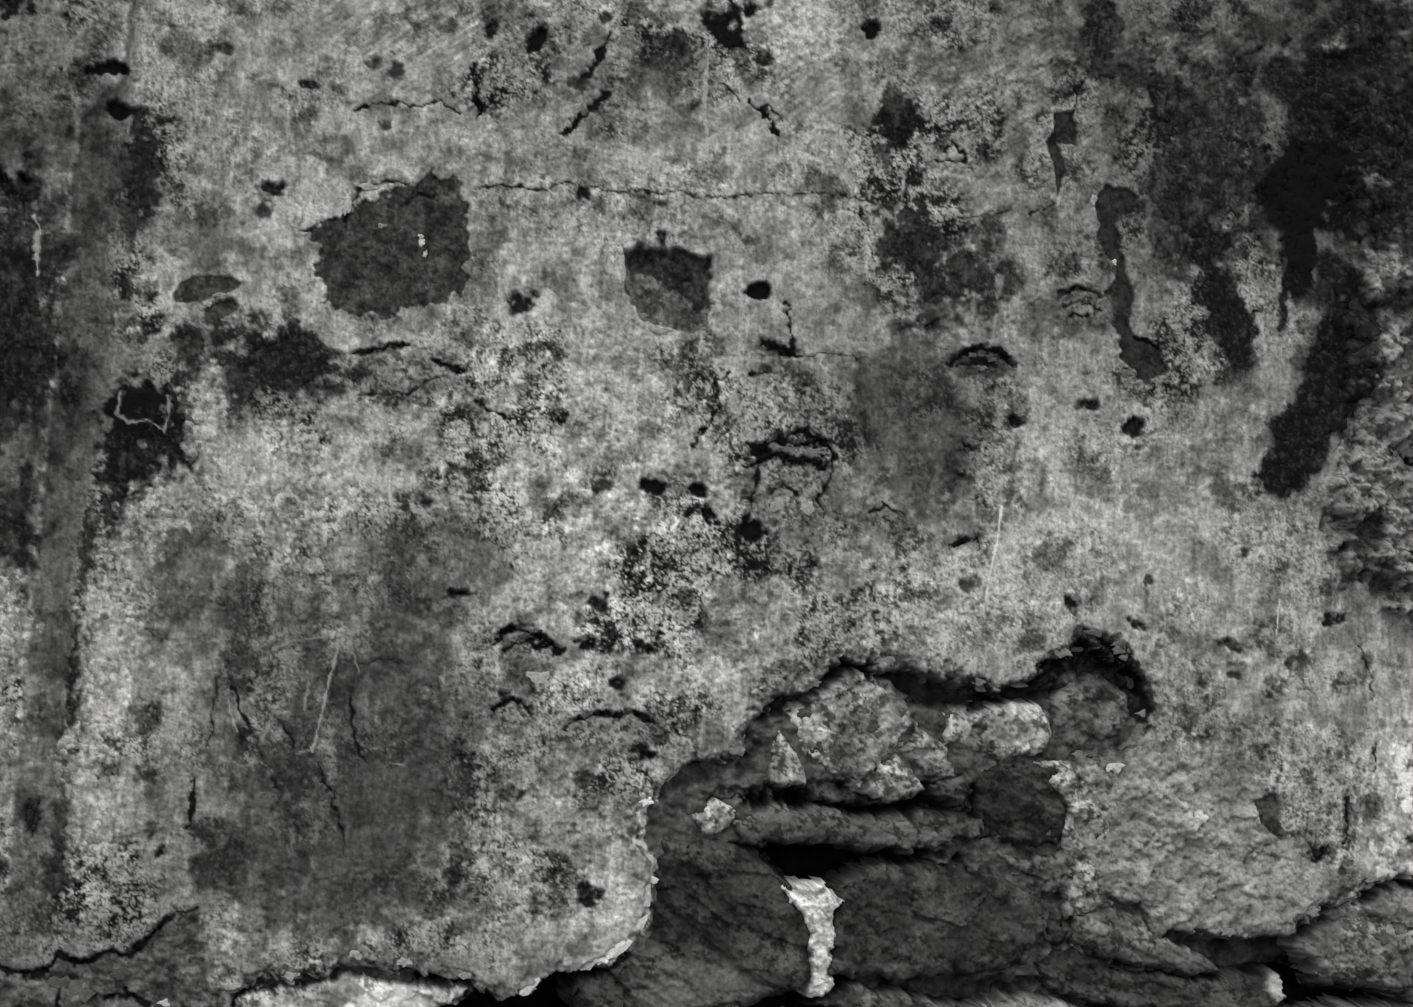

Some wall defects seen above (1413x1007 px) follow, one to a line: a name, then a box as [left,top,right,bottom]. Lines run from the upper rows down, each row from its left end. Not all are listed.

leakage [119,109,173,263]
spalling [617,231,711,334]
peeling [1046,71,1114,195]
peeling [1090,184,1168,385]
leakage [1050,0,1413,498]
flaking render [1297,0,1413,134]
flaking render [1319,158,1413,619]
leakage [0,137,374,897]
leakage [1210,466,1227,505]
peeling [564,594,1413,973]
crack [0,906,199,1007]
flaking render [0,909,548,1007]